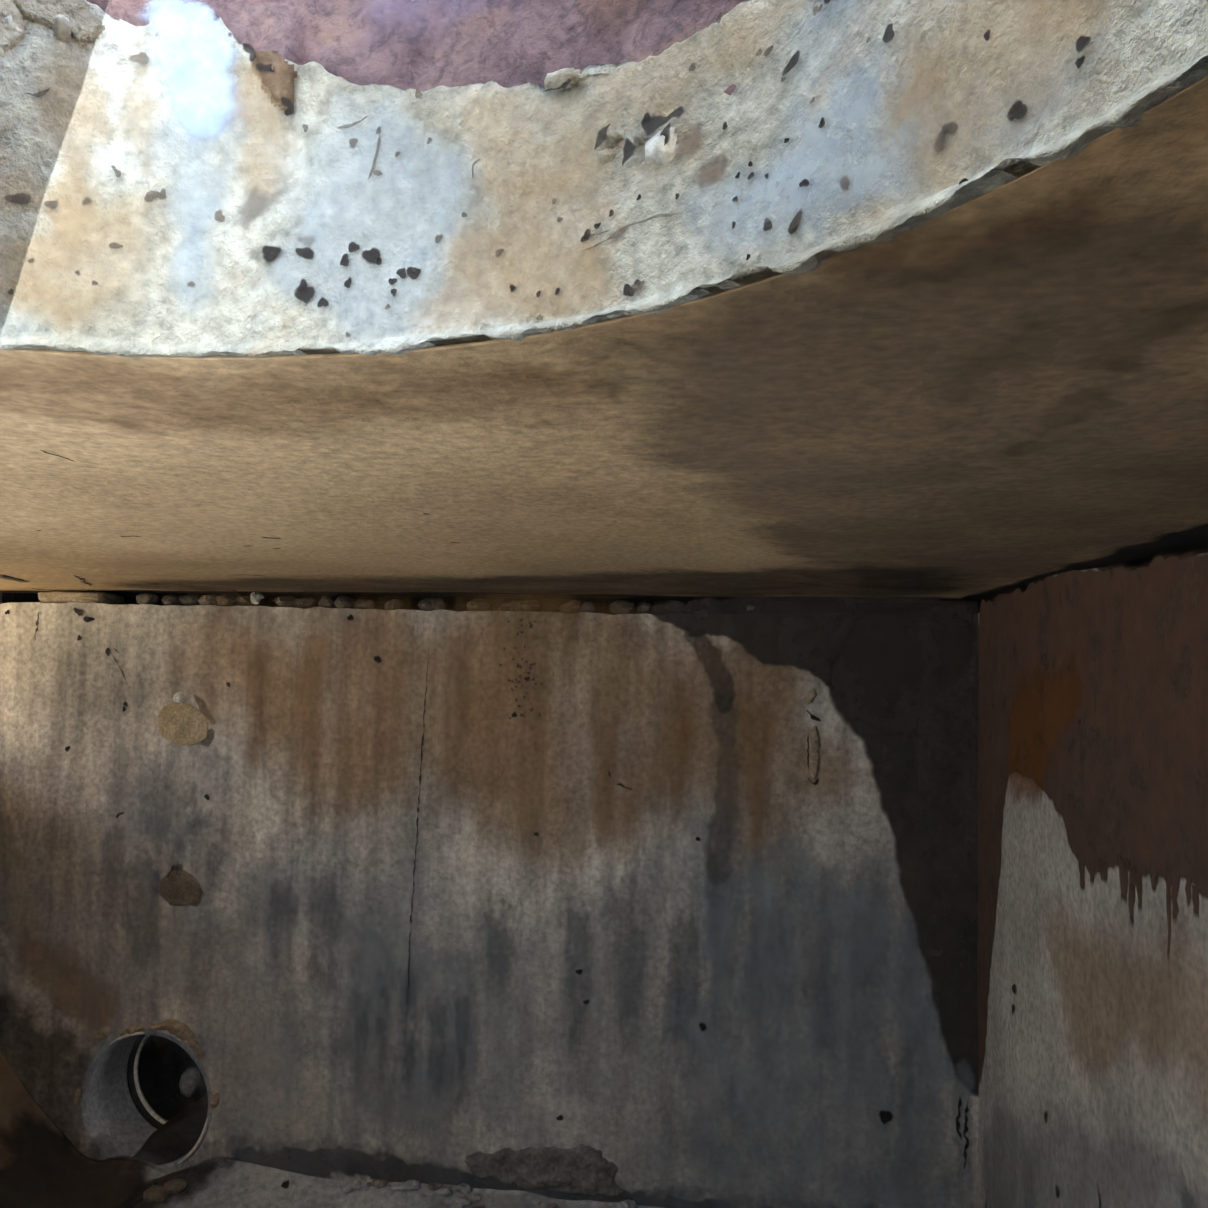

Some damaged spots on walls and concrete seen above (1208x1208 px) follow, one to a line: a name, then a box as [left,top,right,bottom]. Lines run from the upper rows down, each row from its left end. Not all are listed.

spalling [129,52,149,64]
efflorescence [148,0,242,138]
spalling [243,43,298,116]
peeling [544,68,583,92]
spalling [781,51,800,82]
spalling [804,689,821,785]
water stain [0,996,93,1161]
water stain [233,1134,731,1208]